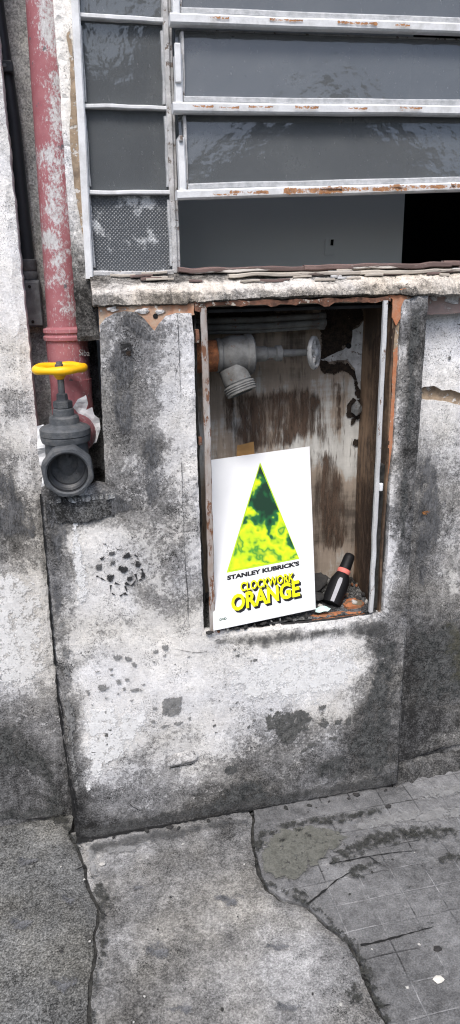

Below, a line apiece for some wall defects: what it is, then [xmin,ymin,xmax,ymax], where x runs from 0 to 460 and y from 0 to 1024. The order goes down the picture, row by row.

spalling [66,29,83,234]
corrosion [283,183,460,195]
leakage [109,346,133,434]
spalling [422,386,460,405]
leakage [0,473,36,538]
leakage [142,434,160,505]
crack [18,494,432,1024]
leakage [0,616,460,1024]